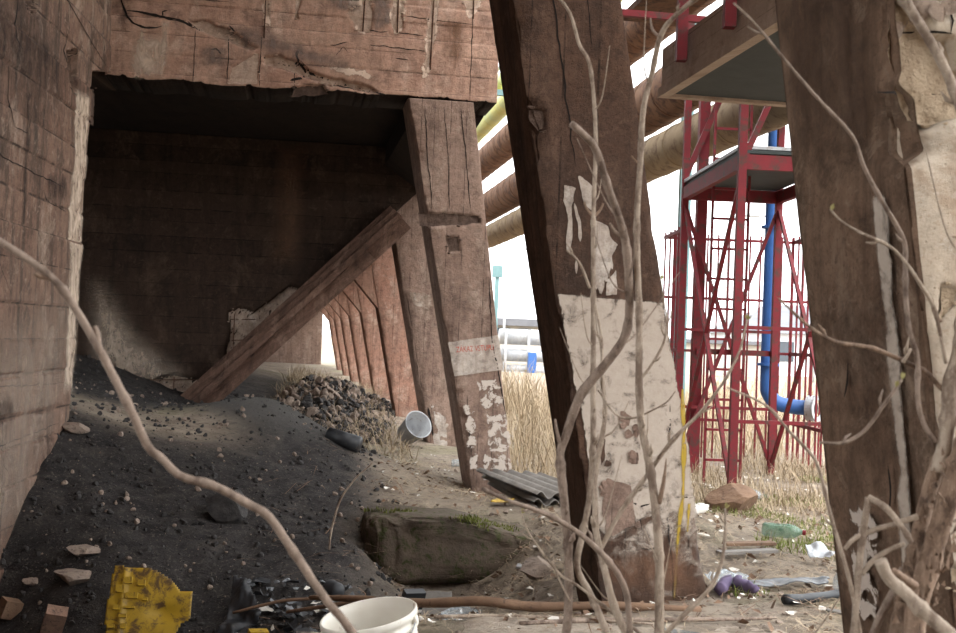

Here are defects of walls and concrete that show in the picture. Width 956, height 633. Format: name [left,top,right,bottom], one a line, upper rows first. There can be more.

crack [121,0,235,79]
spalling [228,53,260,85]
spalling [290,86,329,97]
crack [254,40,385,95]
crack [370,16,473,88]
spalling [886,0,956,128]
crack [425,110,470,209]
peeling [463,377,512,480]